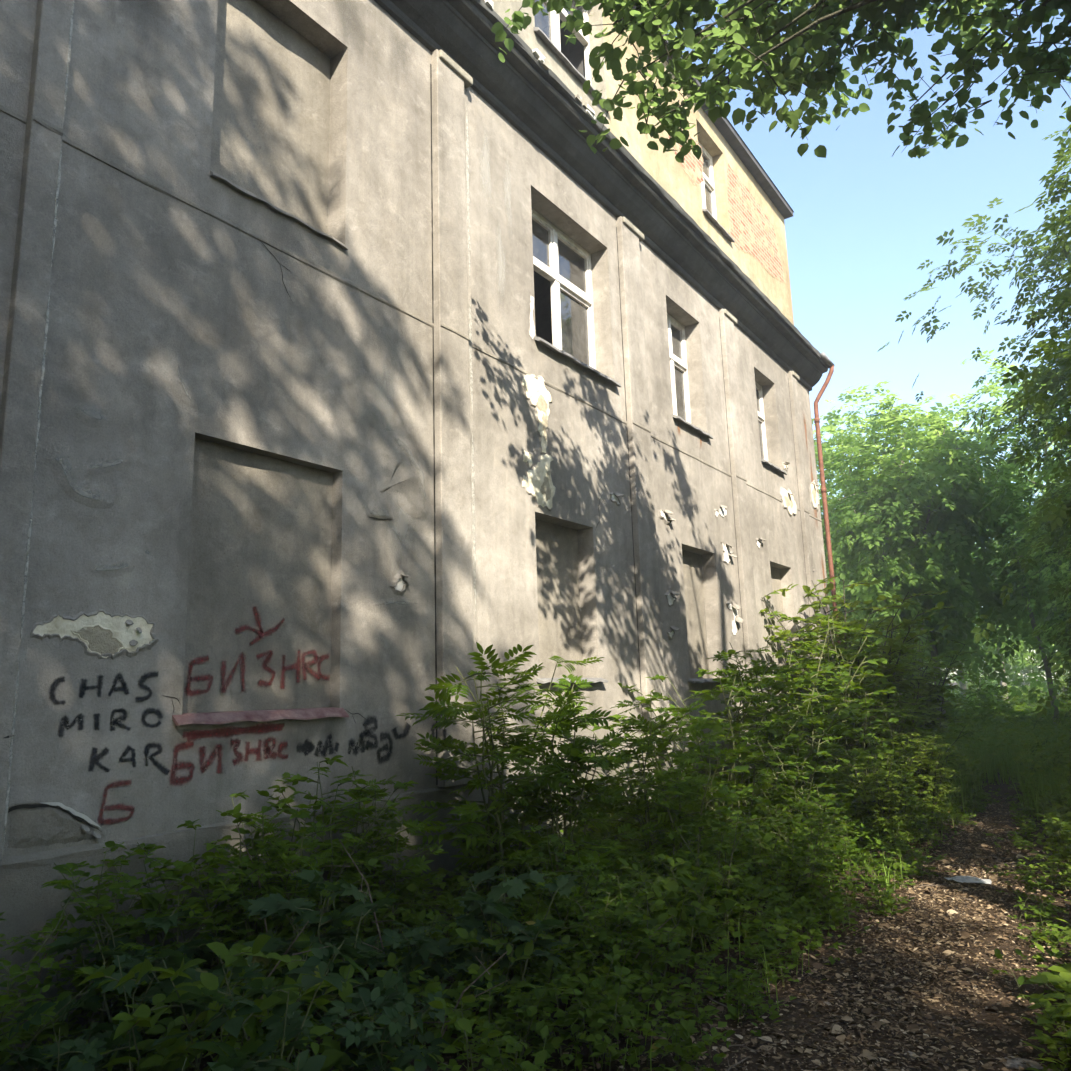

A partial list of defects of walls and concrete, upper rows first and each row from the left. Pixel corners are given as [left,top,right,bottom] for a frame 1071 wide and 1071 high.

flaking render [521,374,556,511]
flaking render [658,509,677,525]
flaking render [714,505,728,519]
flaking render [780,487,797,517]
flaking render [809,480,820,512]
flaking render [721,542,738,565]
flaking render [21,502,159,660]
flaking render [389,572,412,596]
flaking render [725,599,744,636]